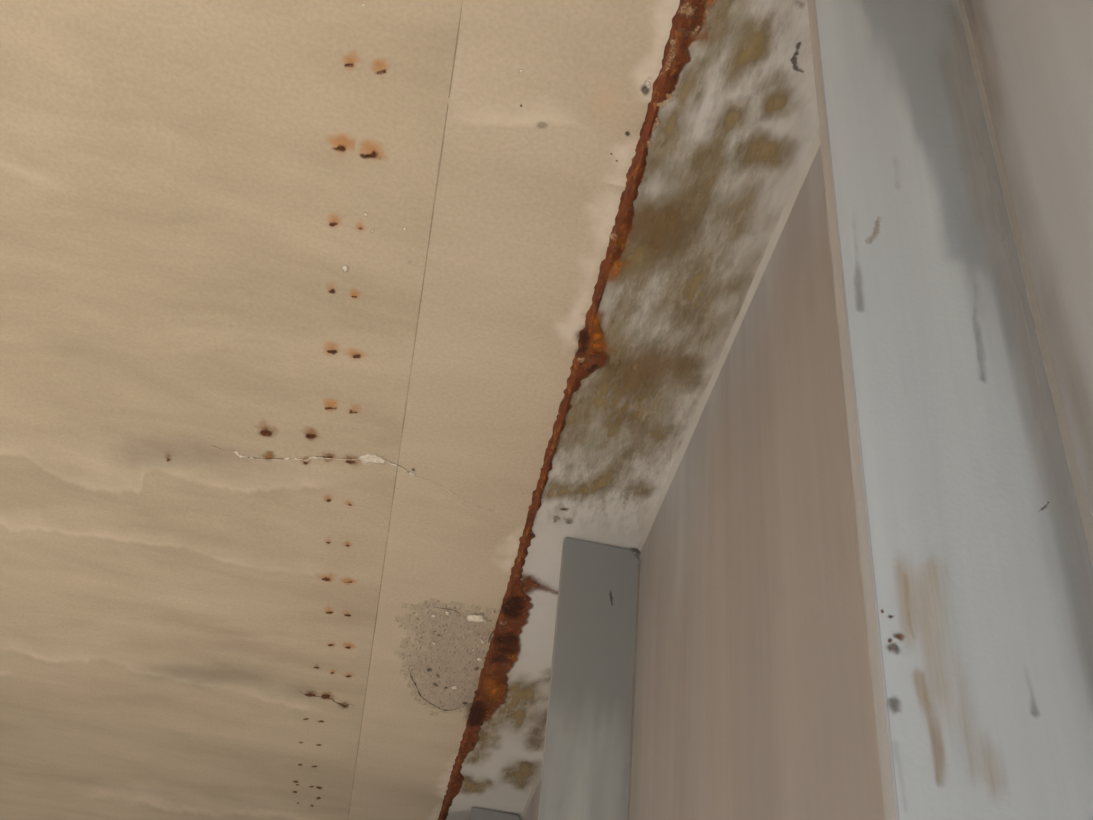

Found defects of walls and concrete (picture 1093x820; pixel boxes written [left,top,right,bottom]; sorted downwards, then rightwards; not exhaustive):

leakage [622,0,680,108]
rust [320,128,392,166]
leakage [448,89,586,131]
leakage [546,130,640,359]
rust [608,108,744,282]
rust [557,314,702,450]
leakage [815,0,1093,820]
crack [214,446,493,511]
leakage [487,510,528,576]
rust [522,576,557,594]
spalling [394,597,522,725]
rust [482,679,546,749]